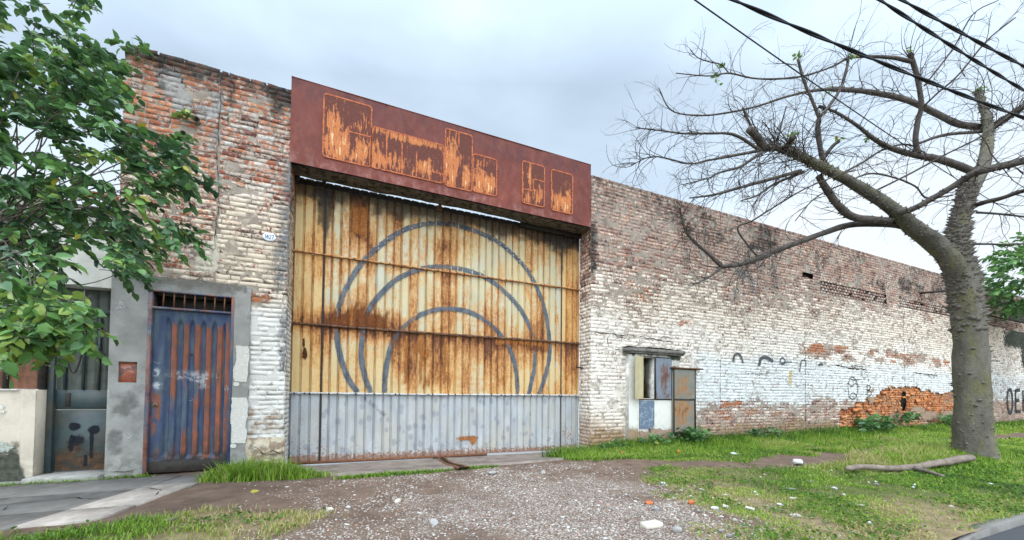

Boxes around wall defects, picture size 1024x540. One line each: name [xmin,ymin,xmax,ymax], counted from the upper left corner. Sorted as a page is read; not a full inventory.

peeling [194,102,218,121]
crack [203,77,252,249]
rust [352,200,368,240]
rust [327,301,389,328]
rust [495,339,549,352]
spalling [839,386,954,429]